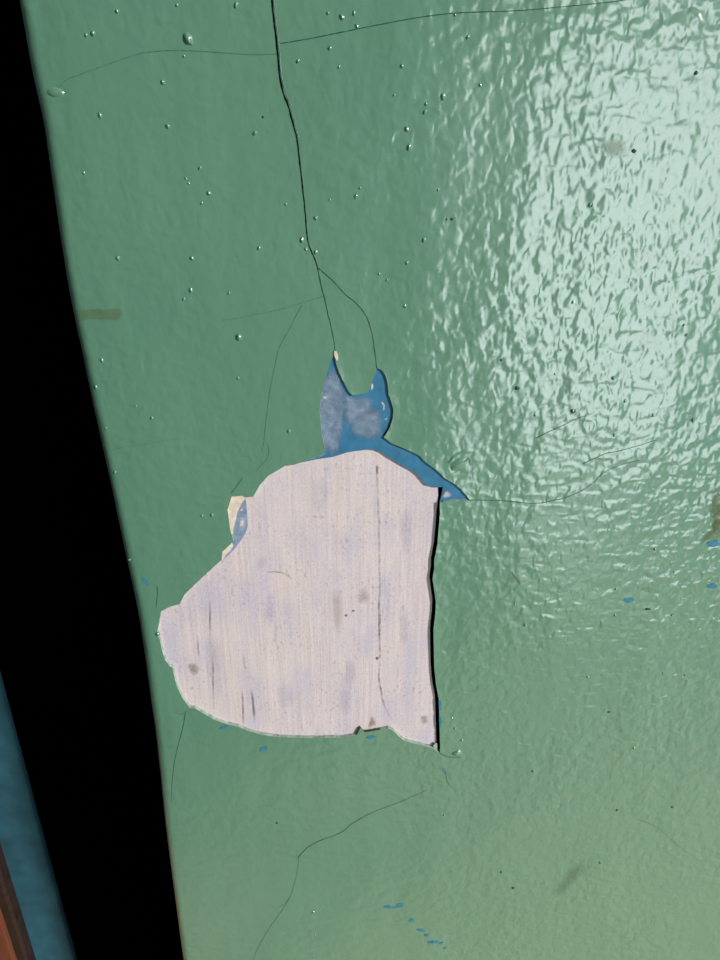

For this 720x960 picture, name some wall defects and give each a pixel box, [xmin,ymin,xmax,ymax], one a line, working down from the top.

crack [58,0,624,493]
peeling [158,351,469,750]
crack [468,440,655,504]
crack [253,753,461,959]